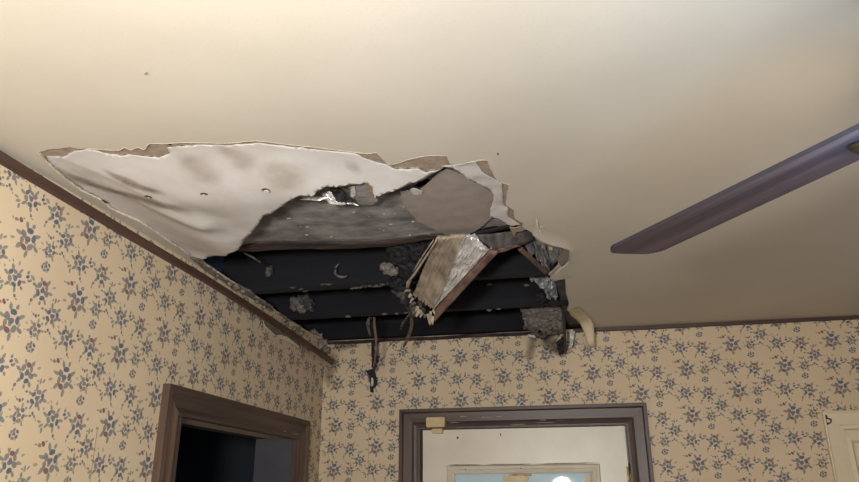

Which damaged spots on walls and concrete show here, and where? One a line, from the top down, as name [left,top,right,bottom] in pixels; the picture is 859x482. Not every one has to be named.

peeling [214,141,523,223]
peeling [532,224,594,347]